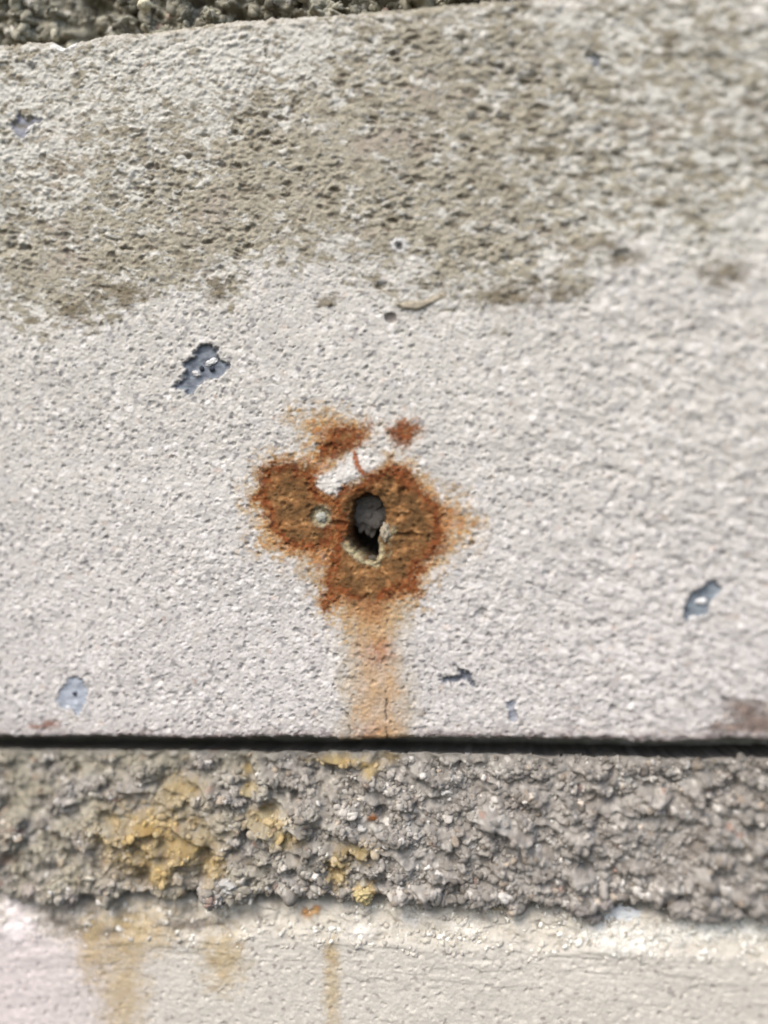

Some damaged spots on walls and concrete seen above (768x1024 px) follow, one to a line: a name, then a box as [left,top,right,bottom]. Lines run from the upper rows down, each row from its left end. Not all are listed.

peeling [174,344,231,395]
corrosion [249,408,479,739]
peeling [684,580,722,621]
peeling [57,676,88,715]